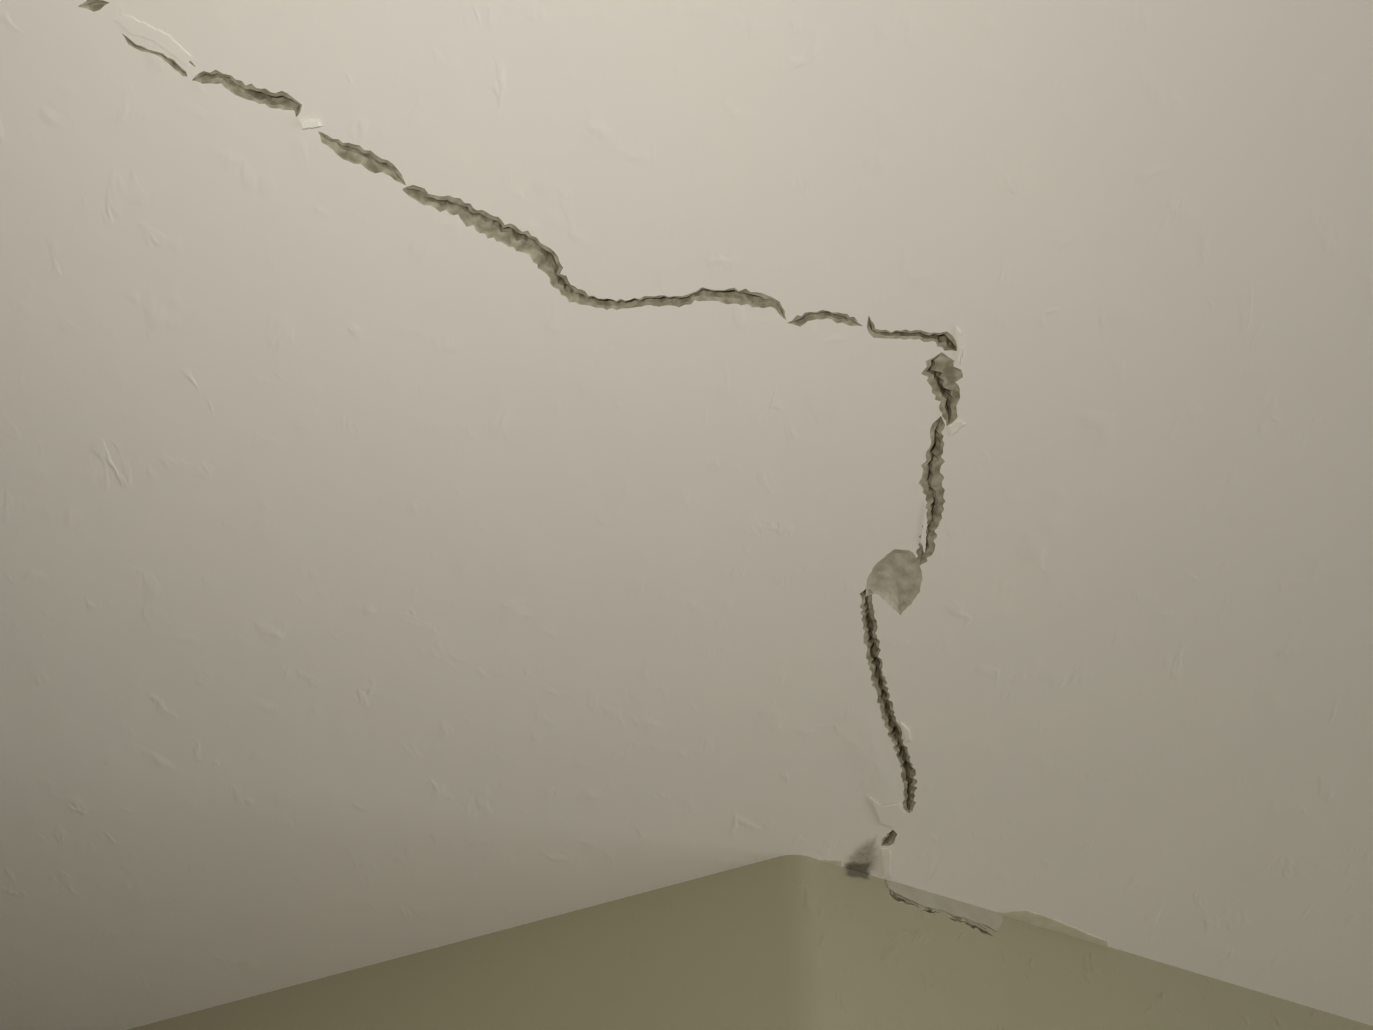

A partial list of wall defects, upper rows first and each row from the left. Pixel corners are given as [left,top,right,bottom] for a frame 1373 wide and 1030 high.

crack [78,0,965,565]
crack [860,589,917,879]